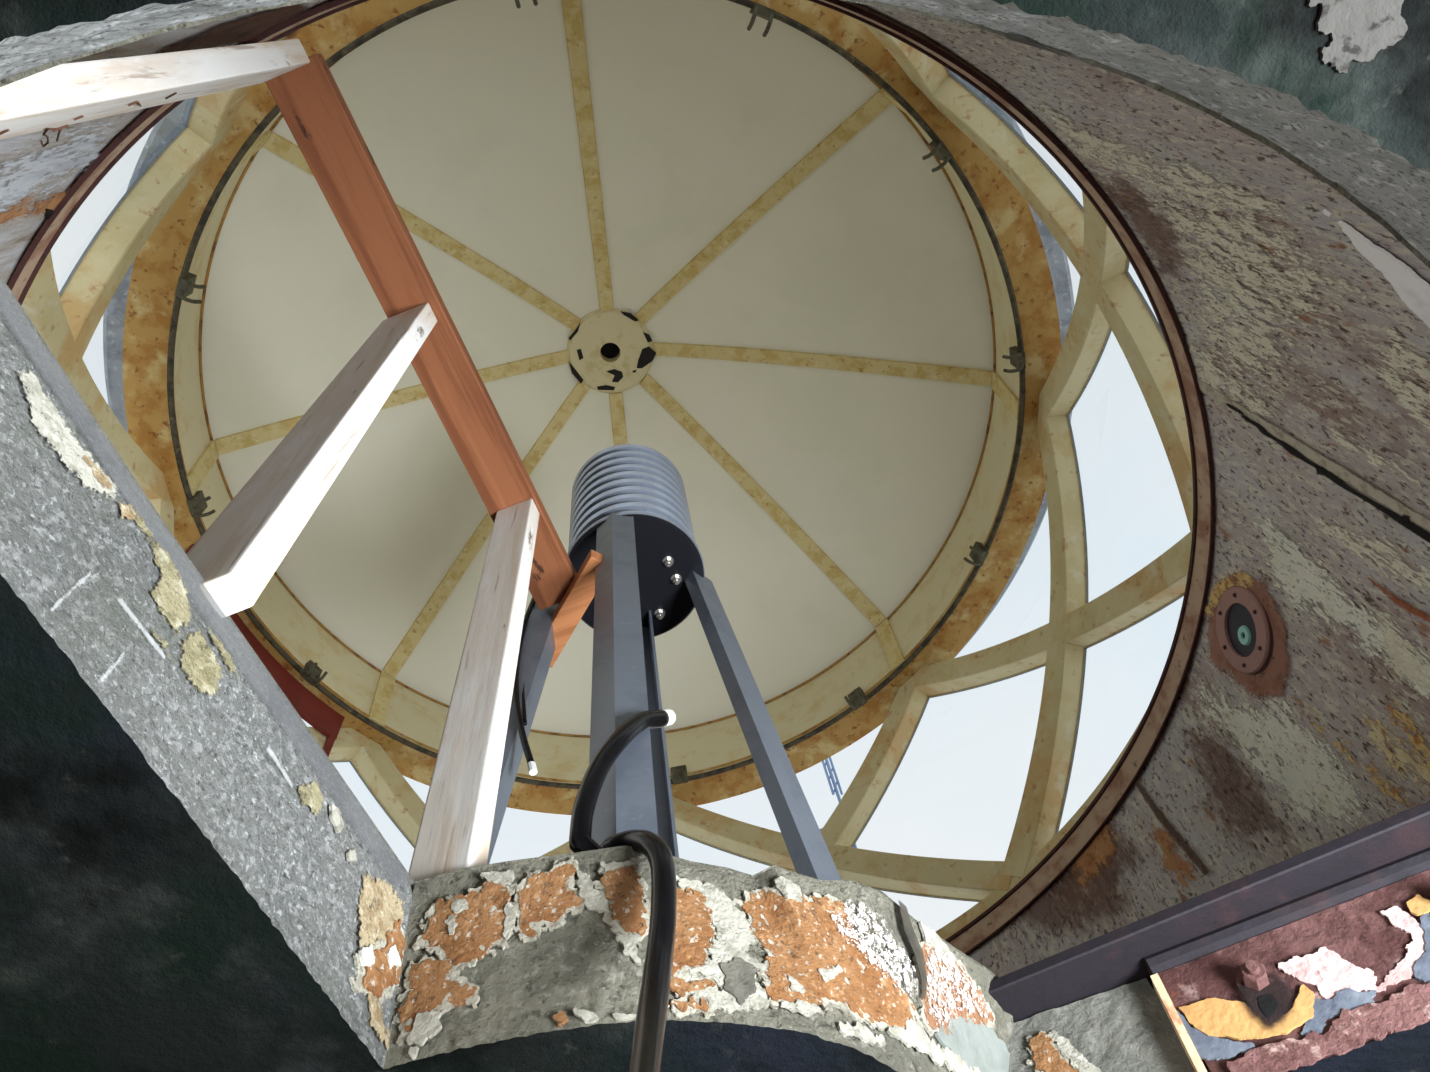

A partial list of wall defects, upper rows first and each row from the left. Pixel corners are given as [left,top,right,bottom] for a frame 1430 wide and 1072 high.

peeling [1306,0,1408,73]
spalling [18,370,237,696]
crack [1197,378,1430,543]
corrosion [1205,570,1430,813]
spalling [298,781,344,833]
peeling [346,849,651,1060]
peeling [668,875,996,1072]
peeling [1026,1030,1101,1072]
peeling [1177,894,1430,1061]